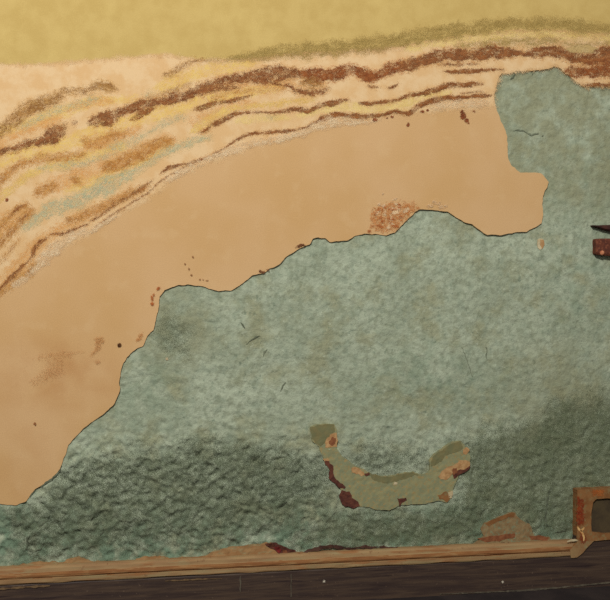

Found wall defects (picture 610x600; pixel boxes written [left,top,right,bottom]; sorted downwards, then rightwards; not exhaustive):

water stain [0,13,610,298]
rust [367,198,420,233]
water stain [0,384,610,566]
peeling [310,424,473,510]
spalling [265,542,296,554]
peeling [474,512,551,544]